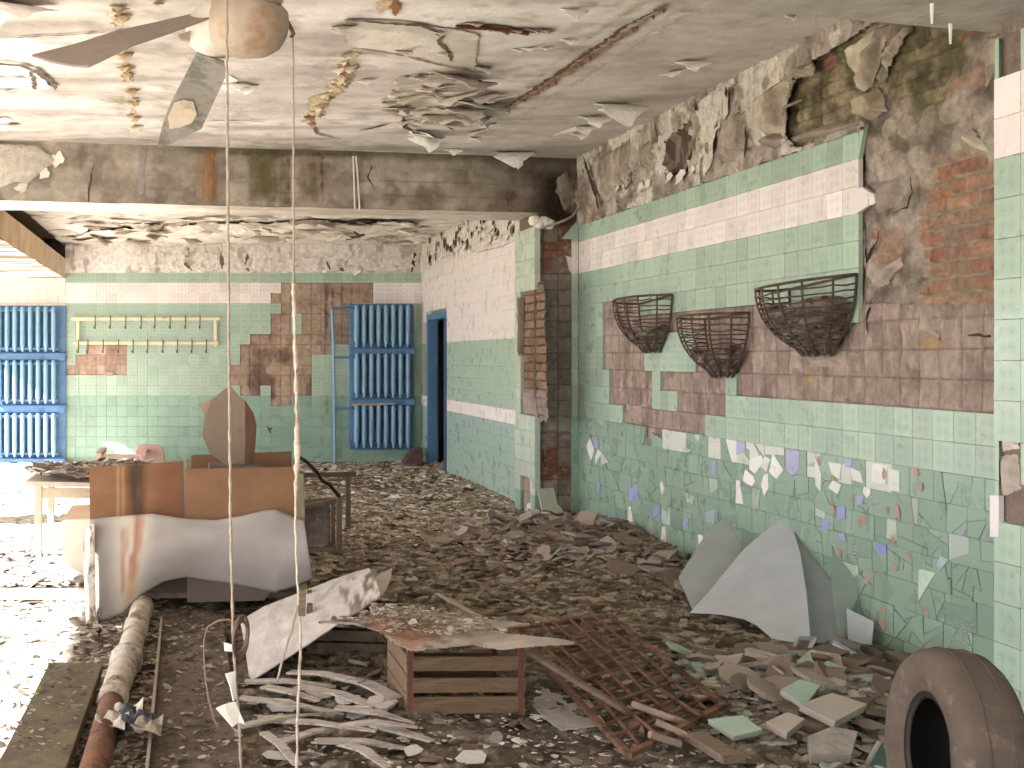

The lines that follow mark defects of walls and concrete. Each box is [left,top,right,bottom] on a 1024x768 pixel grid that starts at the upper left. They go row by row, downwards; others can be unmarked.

peeling [0,144,65,193]
peeling [61,220,513,406]
peeling [329,19,579,156]
peeling [517,217,578,514]
flaking render [602,22,1002,439]
peeling [990,441,1021,537]